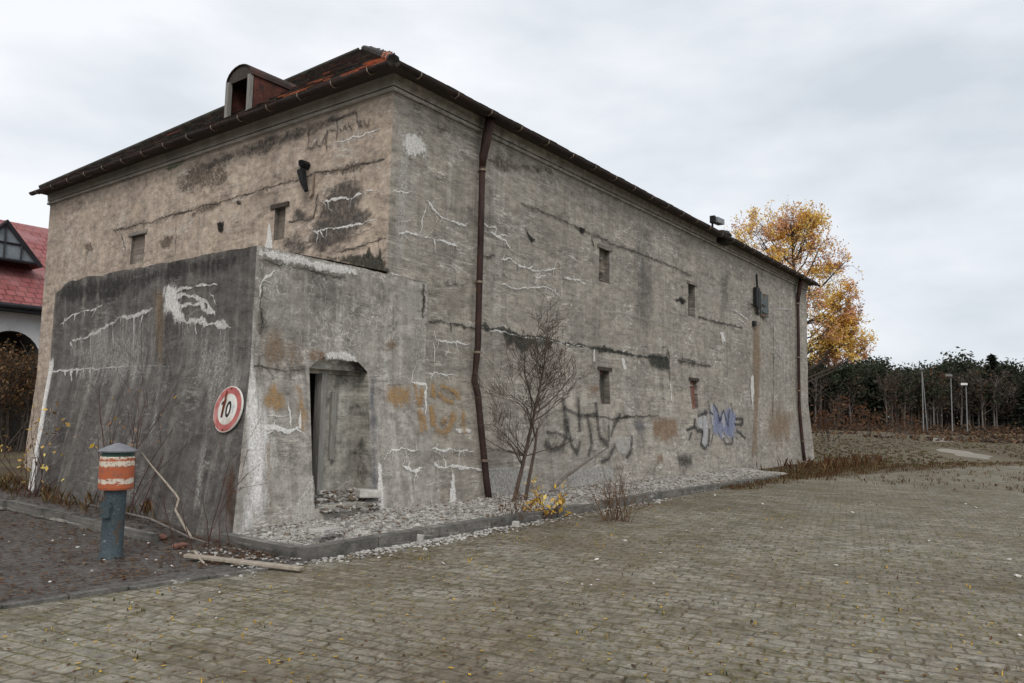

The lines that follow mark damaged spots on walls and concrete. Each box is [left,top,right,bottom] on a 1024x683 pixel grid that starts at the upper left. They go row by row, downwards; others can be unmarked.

water stain [257,180,370,275]
crack [115,130,587,414]
crack [52,305,154,380]
crack [384,428,482,484]